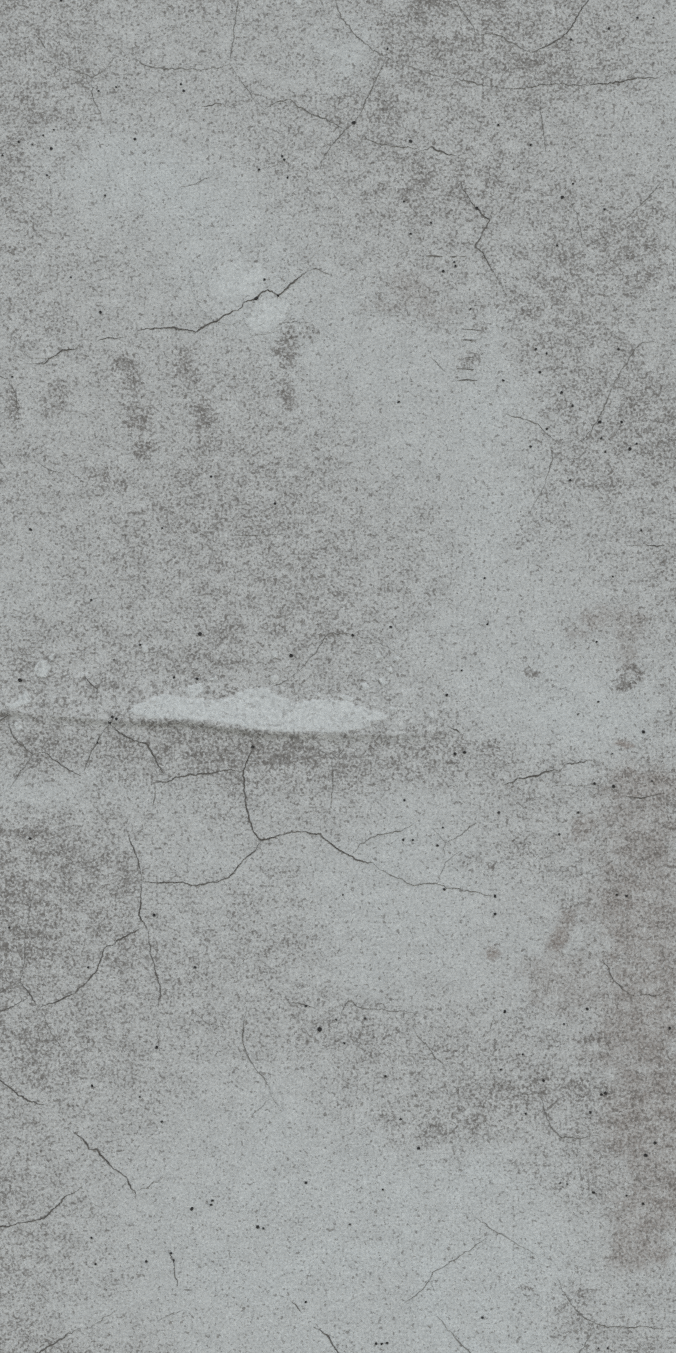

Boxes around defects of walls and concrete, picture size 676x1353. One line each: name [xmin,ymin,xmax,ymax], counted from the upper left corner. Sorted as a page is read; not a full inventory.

crack [37,1,658,295]
crack [0,268,328,418]
peeling [125,674,396,735]
crack [0,676,492,1055]
crack [0,1080,43,1105]
crack [202,1010,276,1114]
crack [289,1001,444,1065]
crack [74,1132,157,1199]
crack [0,1188,80,1227]
crack [39,1314,111,1353]
crack [279,1295,339,1353]